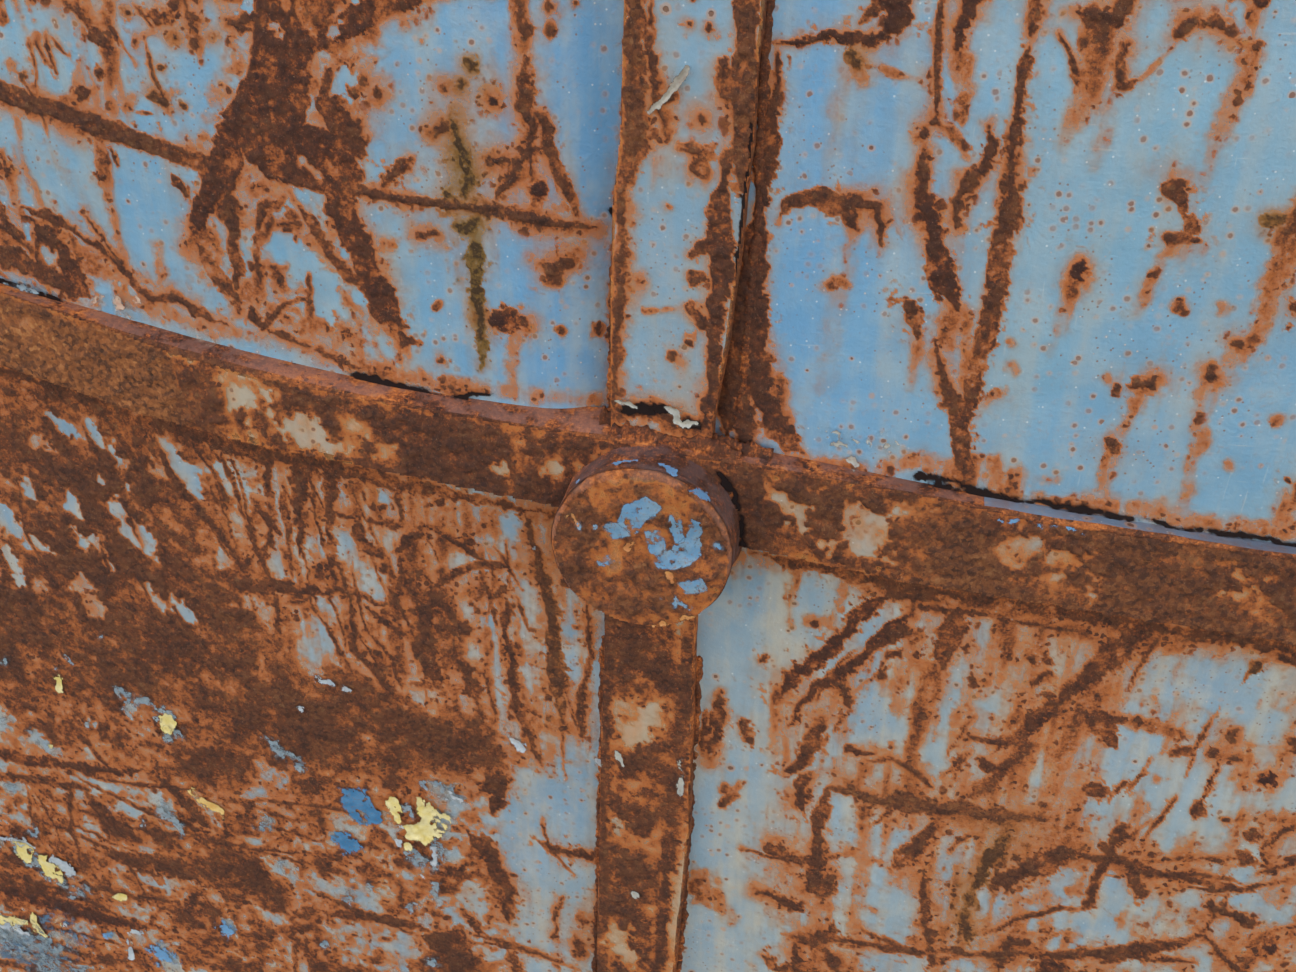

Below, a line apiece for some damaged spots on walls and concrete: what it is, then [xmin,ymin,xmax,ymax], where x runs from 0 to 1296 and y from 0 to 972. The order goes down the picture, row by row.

rust [0,0,1296,541]
rust [0,294,1296,972]
peeling [53,654,74,694]
peeling [315,675,352,693]
peeling [114,686,183,743]
peeling [260,736,308,773]
peeling [509,738,527,753]
peeling [187,787,224,819]
peeling [0,826,91,900]
peeling [329,780,463,915]
peeling [0,912,182,972]
peeling [214,919,237,938]